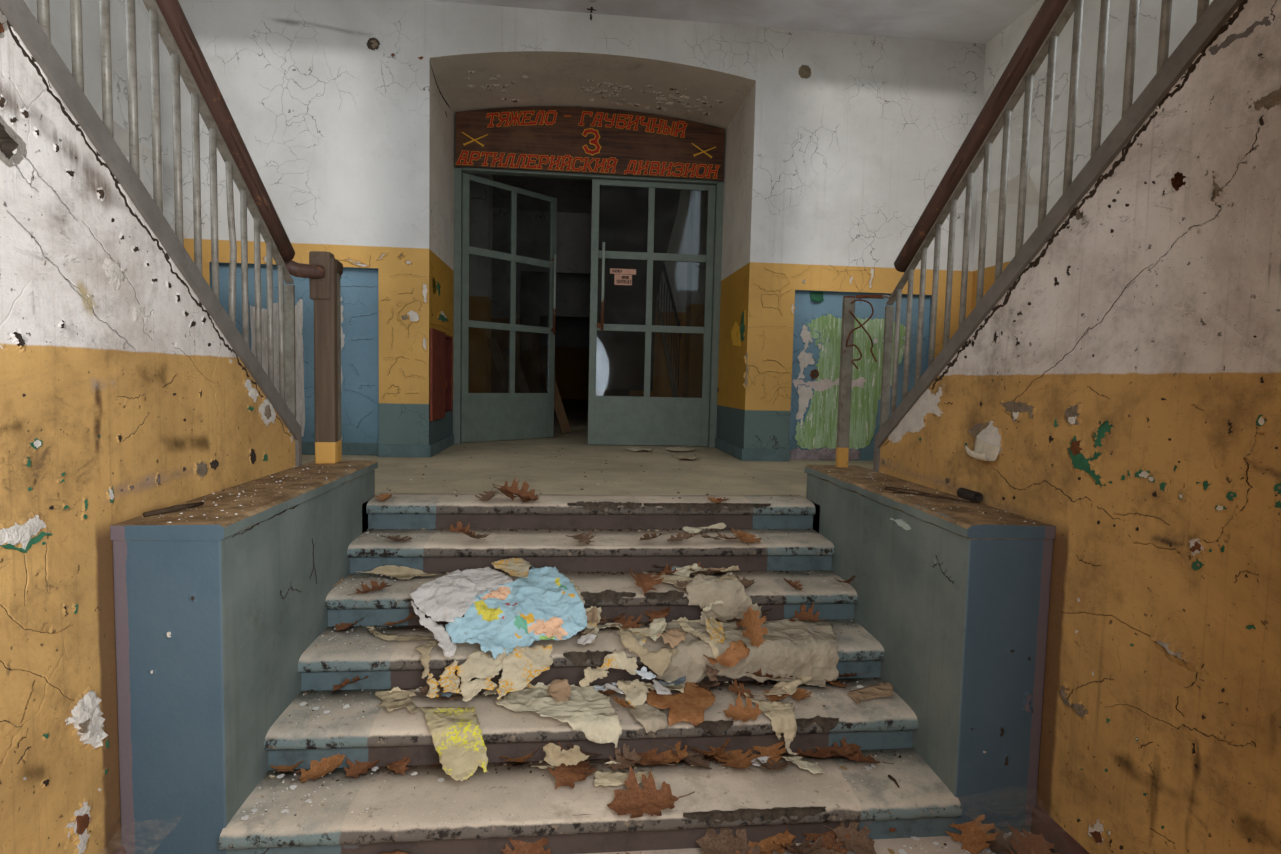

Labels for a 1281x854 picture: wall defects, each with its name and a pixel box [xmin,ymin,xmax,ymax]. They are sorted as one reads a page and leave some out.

spalling [0,10,8,38]
flaking render [0,93,76,179]
crack [930,53,1202,388]
crack [1010,121,1260,401]
spalling [0,328,28,353]
peeling [790,292,953,461]
peeling [24,435,44,469]
peeling [0,497,89,554]
peeling [106,471,161,506]
peeling [1048,401,1241,514]
peeling [1272,481,1281,511]
crack [0,542,80,772]